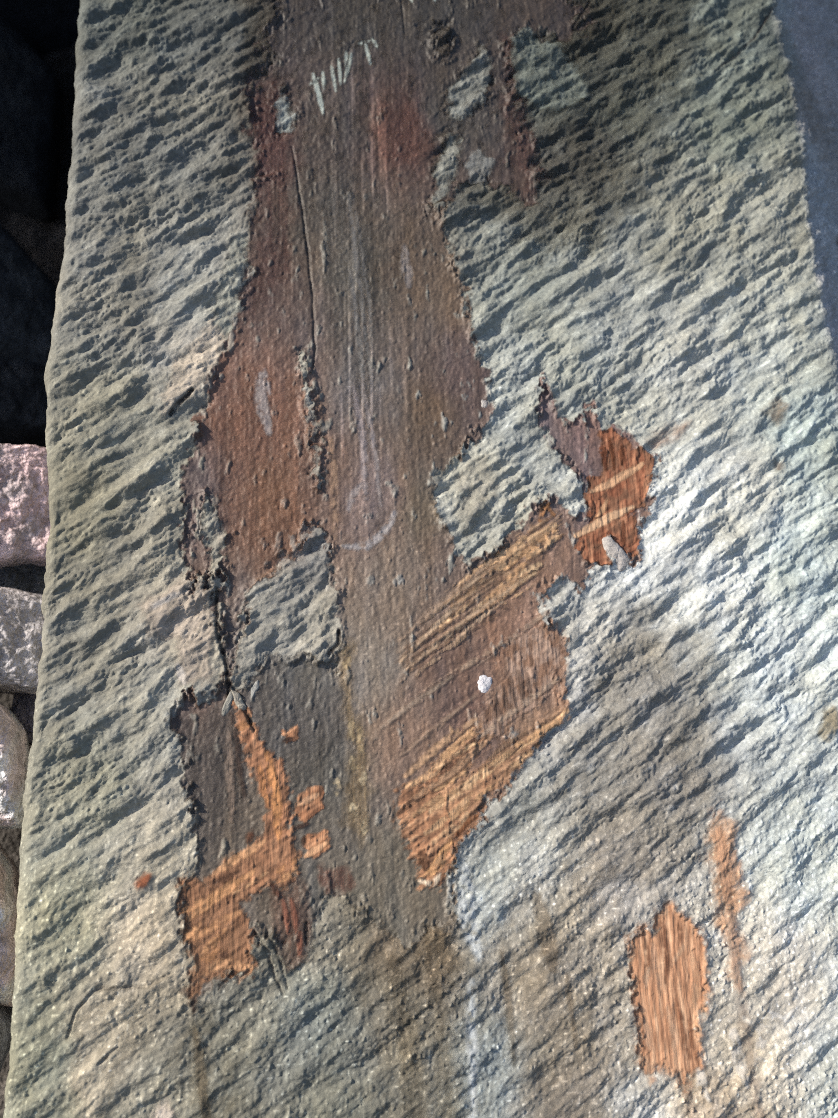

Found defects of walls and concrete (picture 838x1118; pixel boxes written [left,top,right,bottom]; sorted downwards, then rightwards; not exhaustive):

peeling [140,0,661,977]